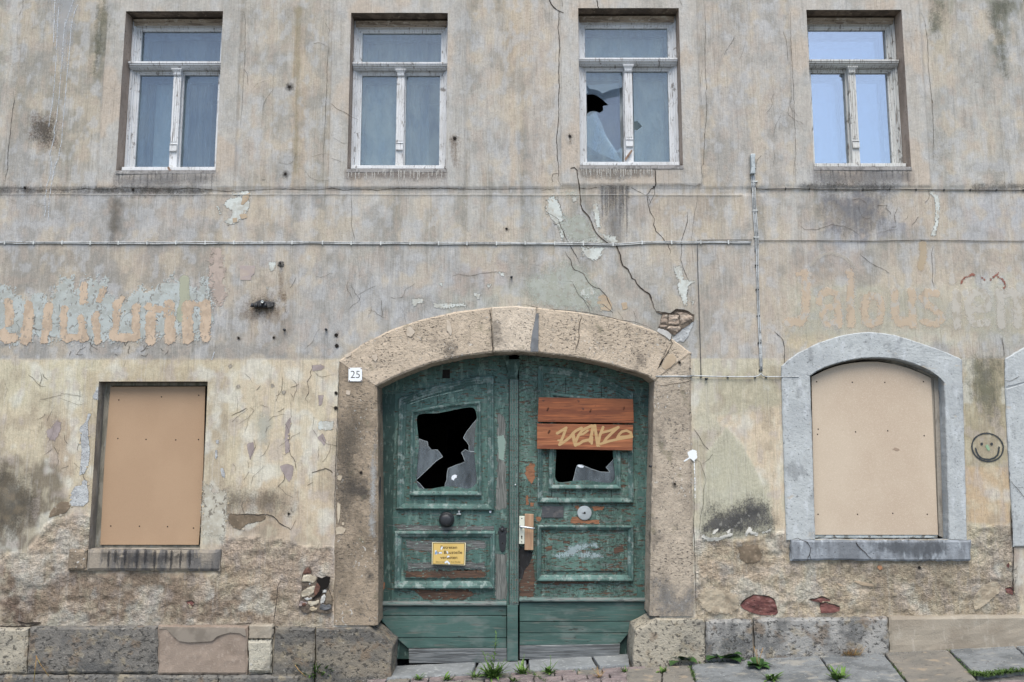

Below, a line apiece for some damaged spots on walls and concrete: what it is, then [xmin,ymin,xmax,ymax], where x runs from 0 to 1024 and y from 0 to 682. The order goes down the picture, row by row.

crack [279,26,486,238]
peeling [217,190,251,225]
peeling [527,191,628,311]
crack [524,0,745,391]
spalling [656,265,695,335]
spalling [49,413,91,518]
peeling [200,440,266,538]
peeling [280,418,294,482]
spalling [298,566,332,613]